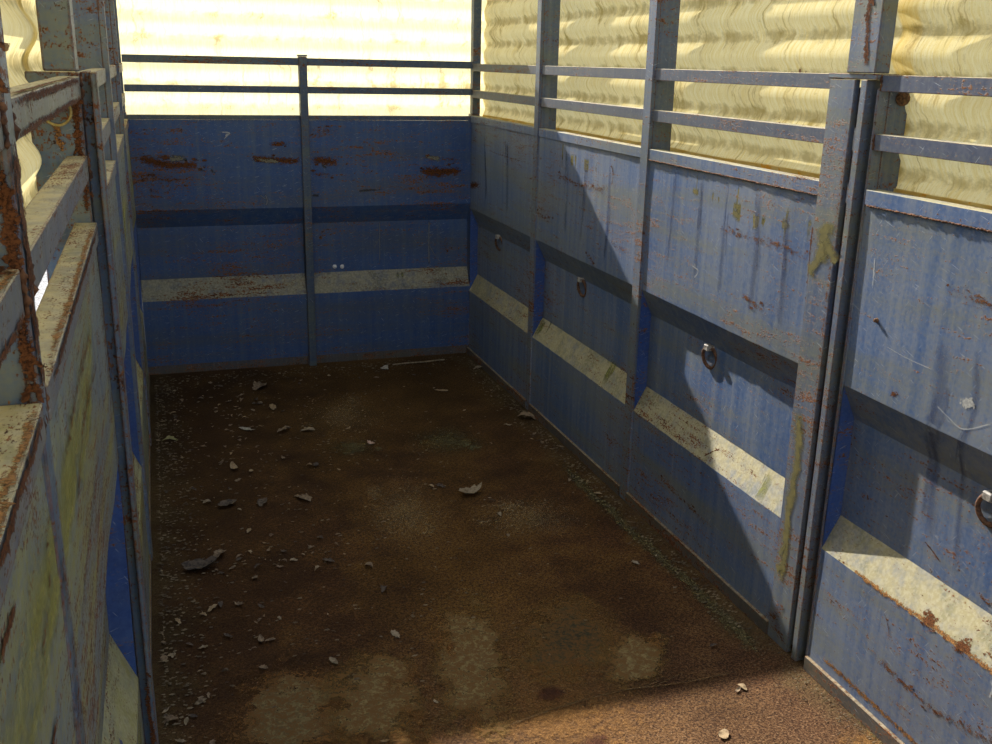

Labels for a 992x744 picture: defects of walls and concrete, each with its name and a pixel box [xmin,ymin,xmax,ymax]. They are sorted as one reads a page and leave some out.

corrosion [252,141,300,165]
corrosion [420,154,462,178]
corrosion [2,604,16,664]
corrosion [839,560,992,675]
corrosion [823,657,917,744]
corrosion [868,648,992,744]